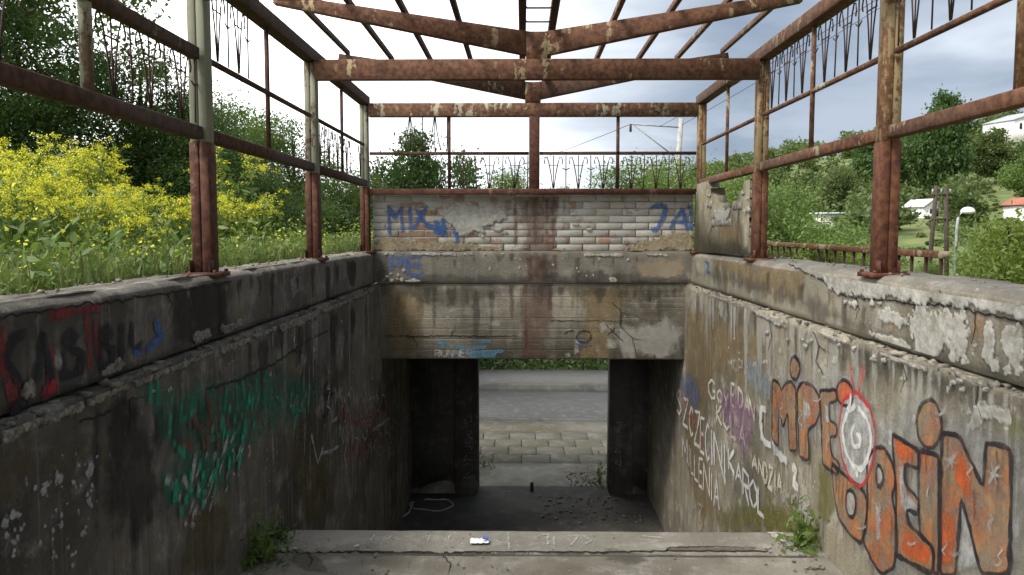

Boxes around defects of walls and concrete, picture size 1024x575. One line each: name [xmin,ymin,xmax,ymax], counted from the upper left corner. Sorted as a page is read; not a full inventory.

peeling [375,203,527,270]
peeling [706,194,730,224]
spalling [2,290,373,446]
crack [384,330,516,347]
crack [551,302,646,359]
damp [572,285,631,358]
spalling [697,290,856,392]
peeling [807,273,1024,380]
peeling [946,378,1019,441]
peeling [25,453,98,508]
peeling [2,509,26,558]
peeling [39,502,87,568]